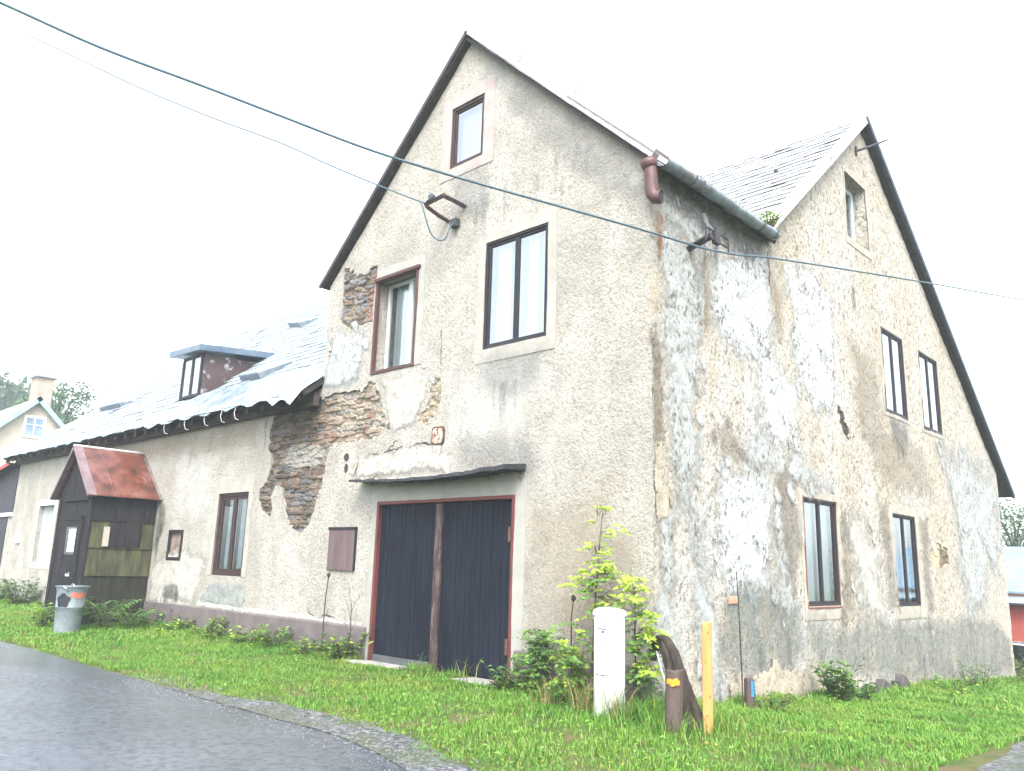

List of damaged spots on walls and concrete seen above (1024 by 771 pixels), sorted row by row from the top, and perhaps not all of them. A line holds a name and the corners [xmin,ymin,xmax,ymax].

flaking render [259,266,450,532]
peeling [649,195,859,703]